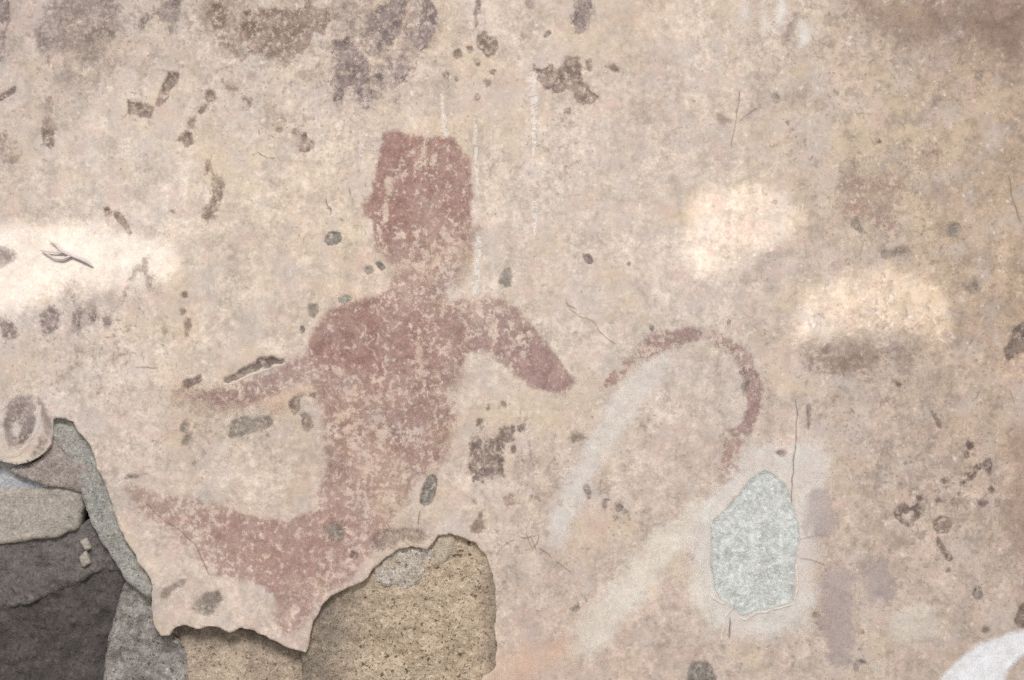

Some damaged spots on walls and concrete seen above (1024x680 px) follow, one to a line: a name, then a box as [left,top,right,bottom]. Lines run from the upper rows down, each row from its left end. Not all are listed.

peeling [416,329,441,381]
flaking render [0,392,497,680]